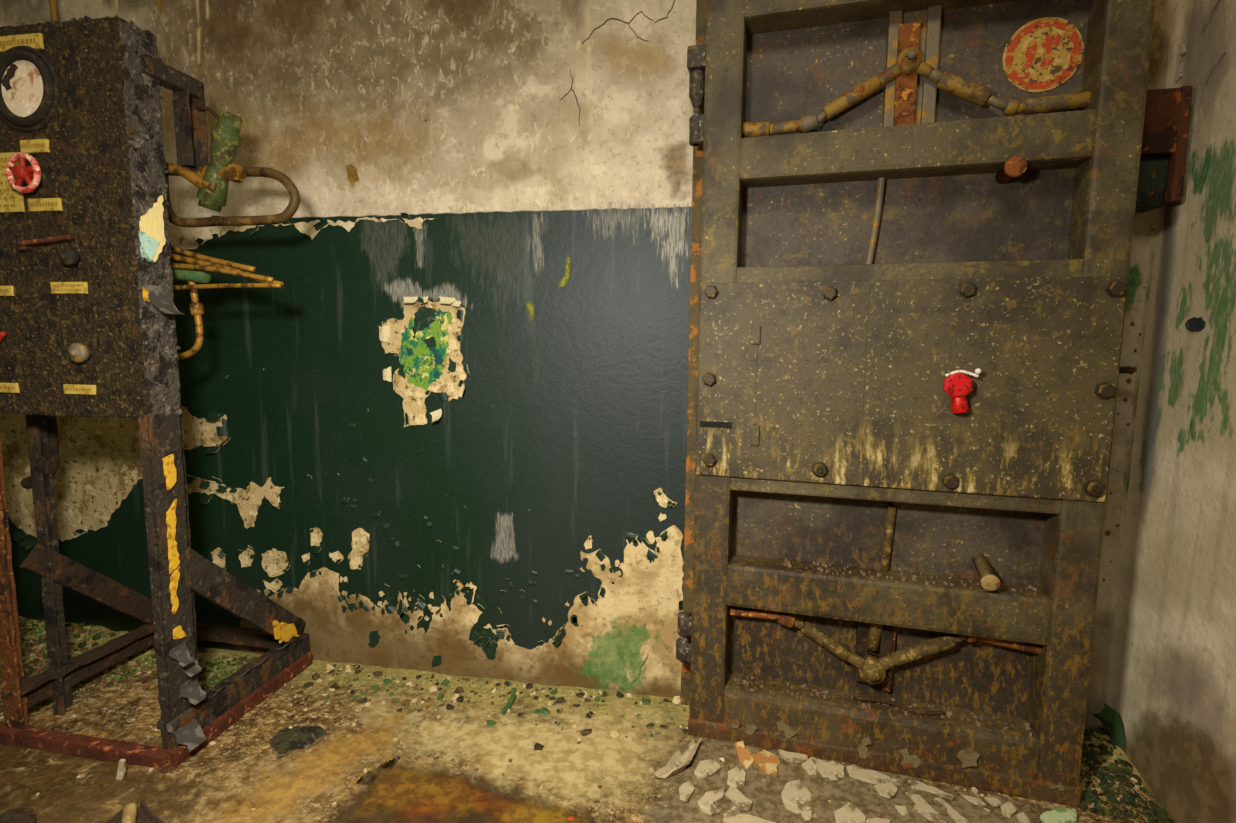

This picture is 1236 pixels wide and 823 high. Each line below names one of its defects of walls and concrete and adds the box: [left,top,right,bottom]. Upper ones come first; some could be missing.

water stain [2,64,18,91]
peeling [106,15,434,293]
water stain [108,0,544,170]
crack [560,71,580,126]
crack [582,0,675,44]
water stain [644,146,692,288]
peeling [139,309,230,454]
peeling [379,294,470,427]
peeling [52,416,143,542]
peeling [186,473,284,529]
peeling [211,487,684,716]
water stain [329,764,592,823]